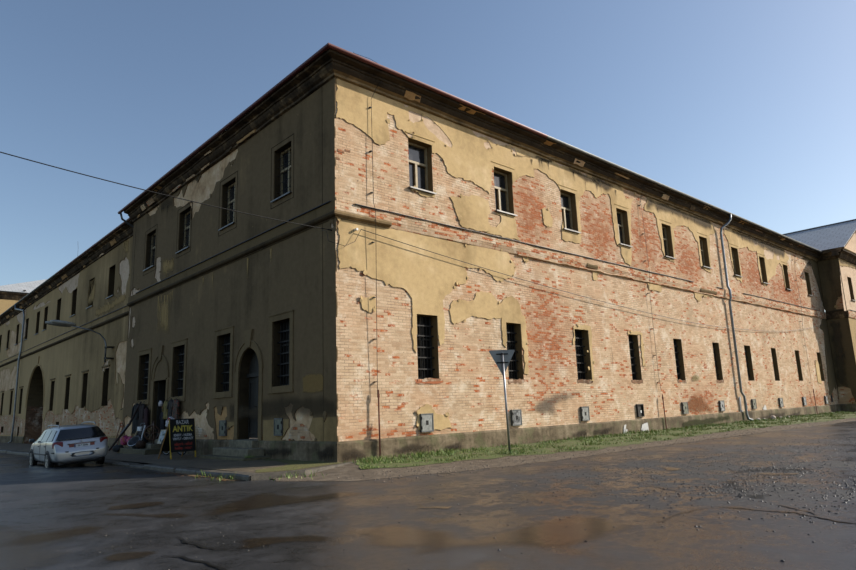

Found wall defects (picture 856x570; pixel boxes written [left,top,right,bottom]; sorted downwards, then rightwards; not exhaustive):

spalling [137,149,238,219]
peeling [329,78,636,381]
peeling [644,194,789,288]
spalling [116,258,139,296]
spalling [0,262,80,391]
spalling [41,308,136,437]
peeling [627,330,646,366]
spalling [179,403,234,440]
spalling [282,409,317,441]